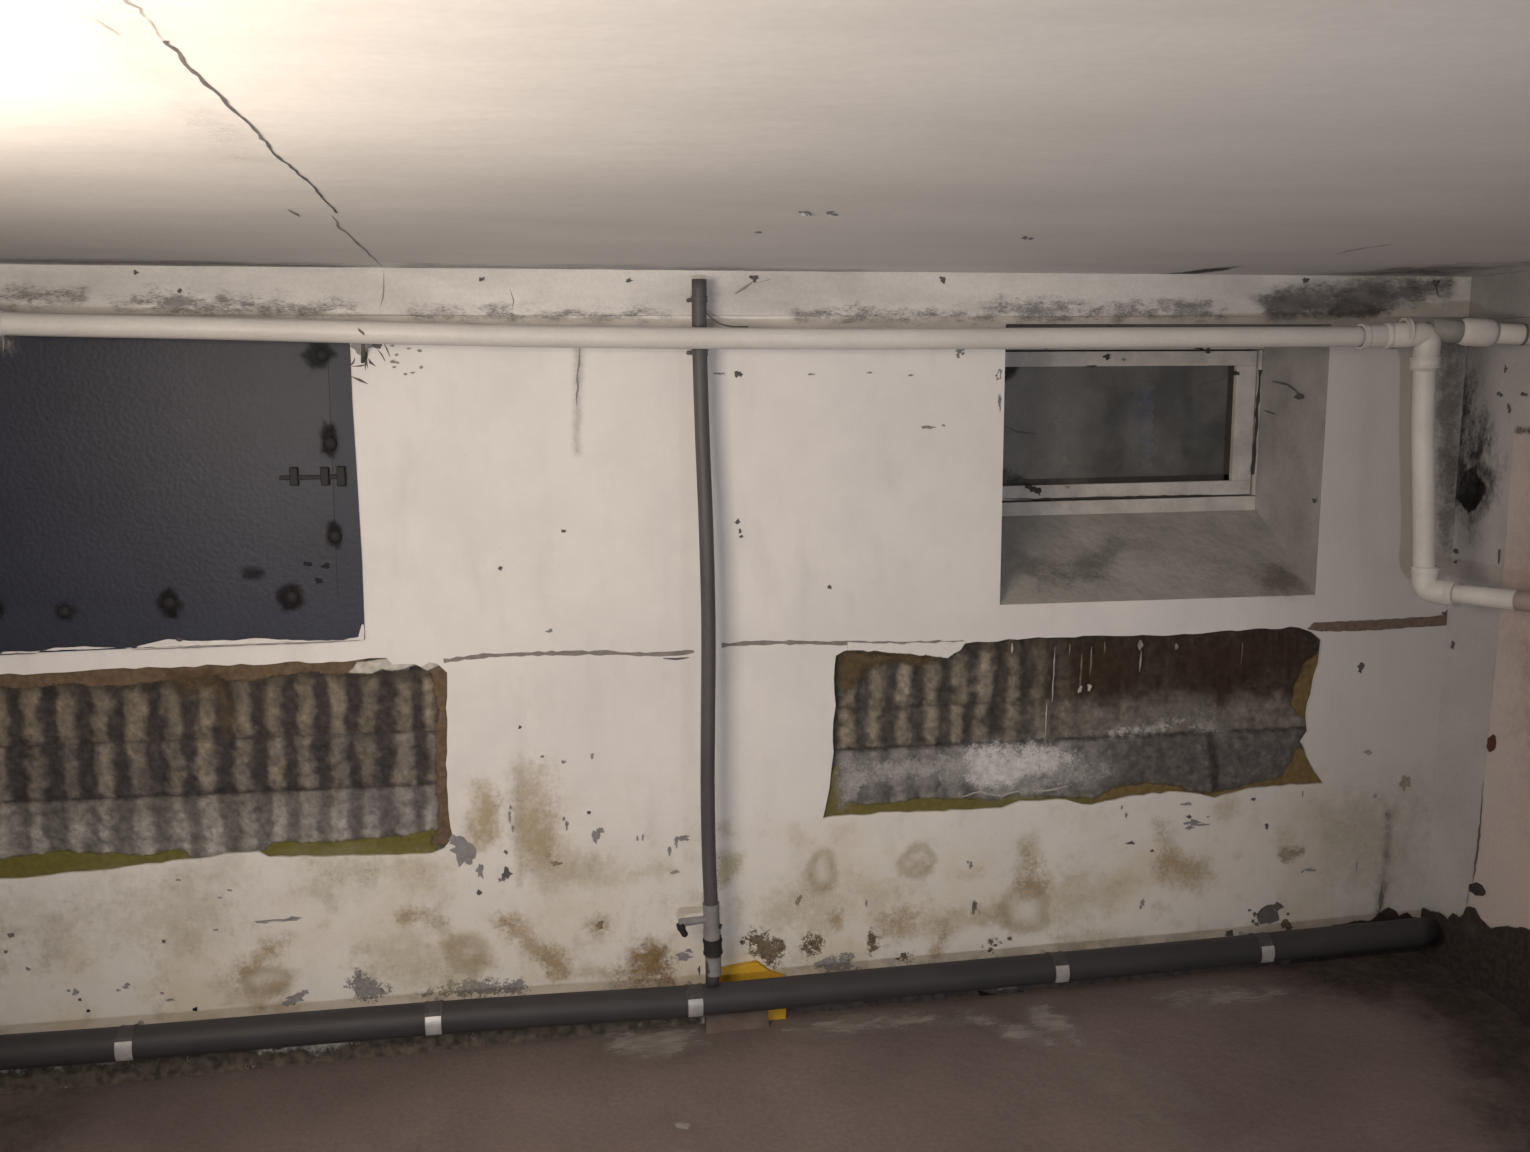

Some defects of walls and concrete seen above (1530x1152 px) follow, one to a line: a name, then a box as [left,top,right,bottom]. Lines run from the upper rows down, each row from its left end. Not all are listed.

crack [93,0,384,306]
damp [1259,279,1452,319]
damp [1436,342,1463,564]
flaking render [0,658,513,896]
flaking render [823,627,1321,830]
peeling [282,990,309,1007]
flaking render [0,1017,702,1096]
damp [739,914,912,972]